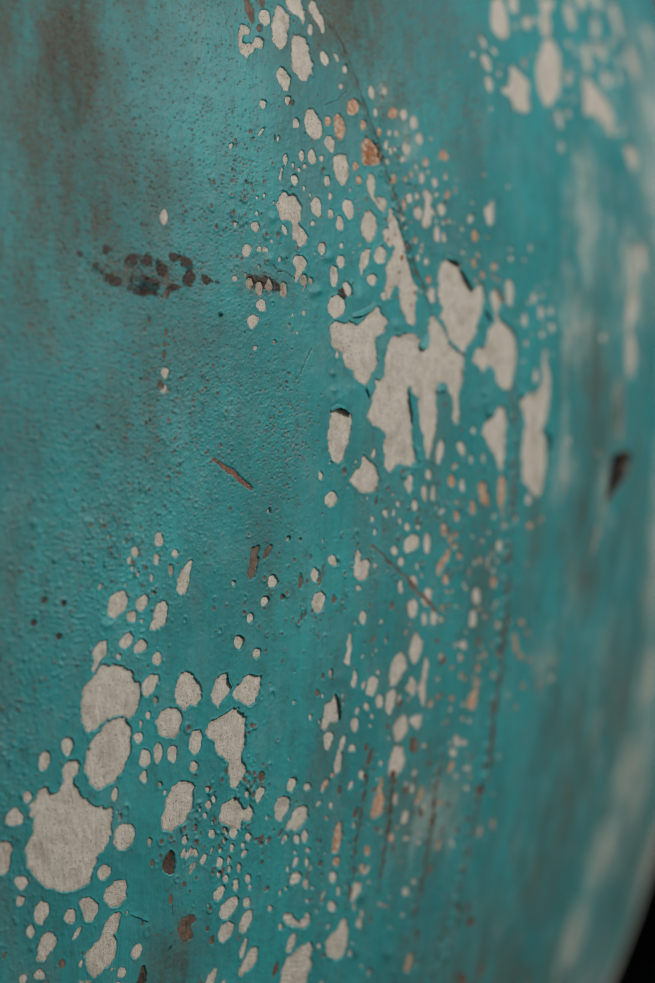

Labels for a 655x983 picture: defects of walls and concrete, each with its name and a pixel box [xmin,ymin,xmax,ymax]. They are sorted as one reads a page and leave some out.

peeling [237,0,347,106]
crack [325,37,448,342]
peeling [0,85,565,983]